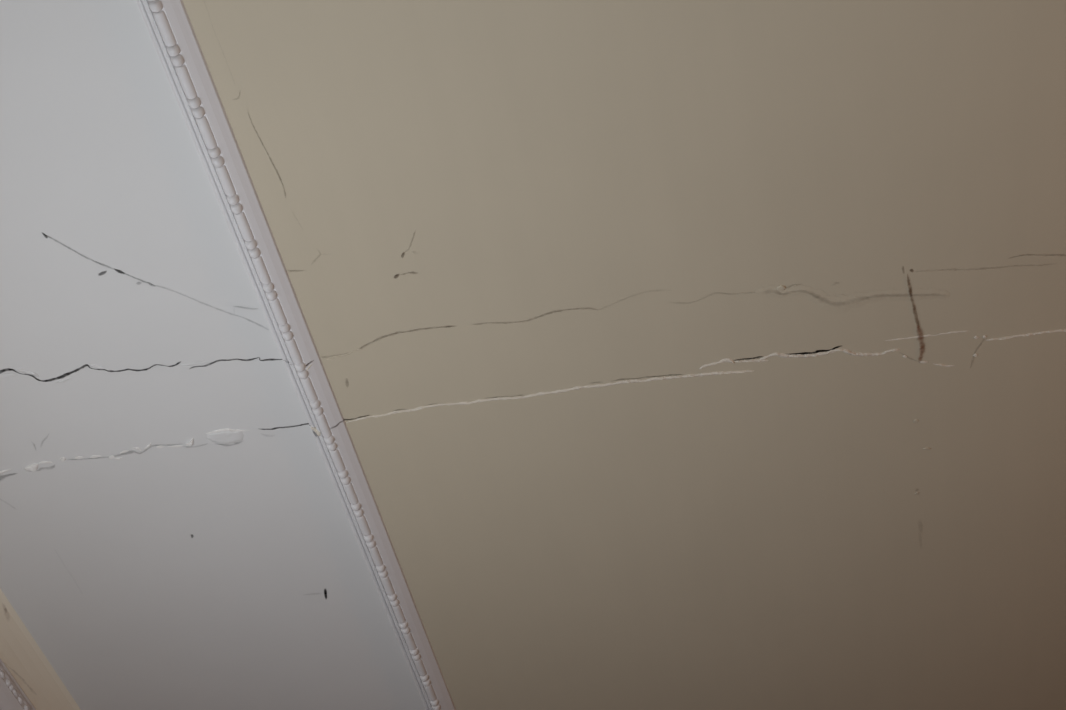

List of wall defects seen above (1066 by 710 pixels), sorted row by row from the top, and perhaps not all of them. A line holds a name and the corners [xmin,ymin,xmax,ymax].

crack [0,357,282,383]
crack [262,329,1066,436]